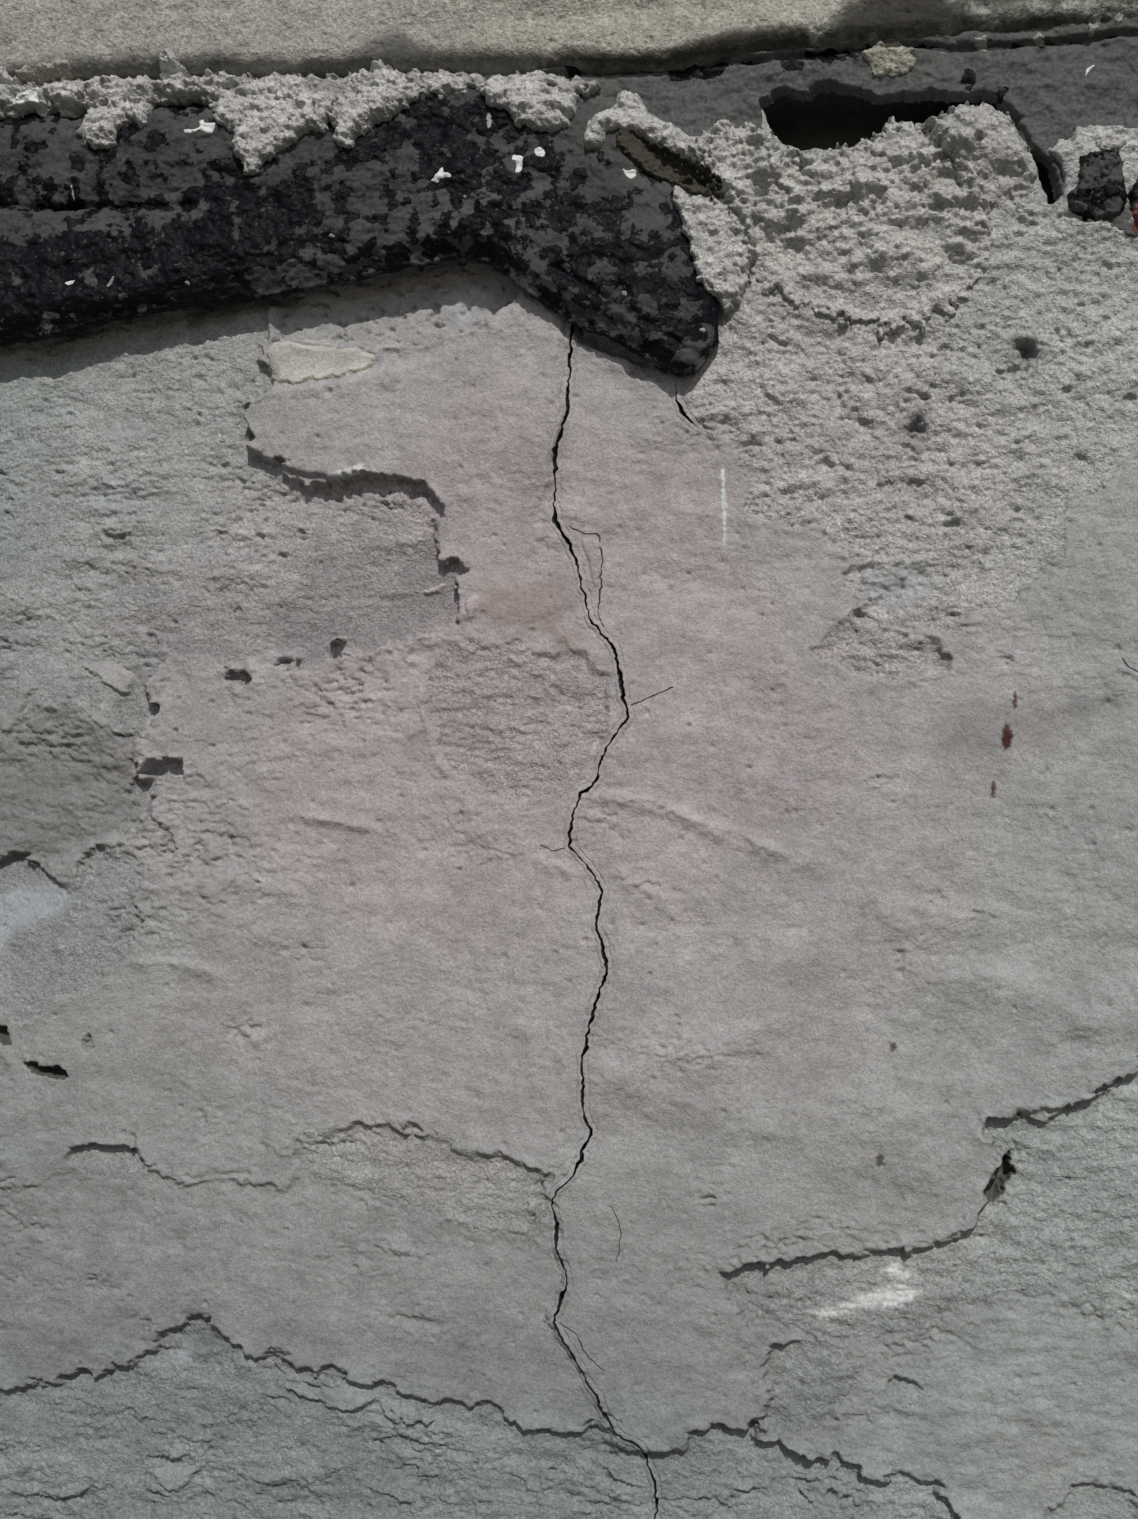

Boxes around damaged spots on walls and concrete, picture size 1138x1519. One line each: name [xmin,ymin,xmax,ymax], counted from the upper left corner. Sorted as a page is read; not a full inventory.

spalling [10,86,50,114]
spalling [0,297,613,806]
crack [671,377,717,441]
spalling [577,125,1138,684]
spalling [0,843,144,1023]
crack [529,322,673,1519]
spalling [0,1055,1138,1519]